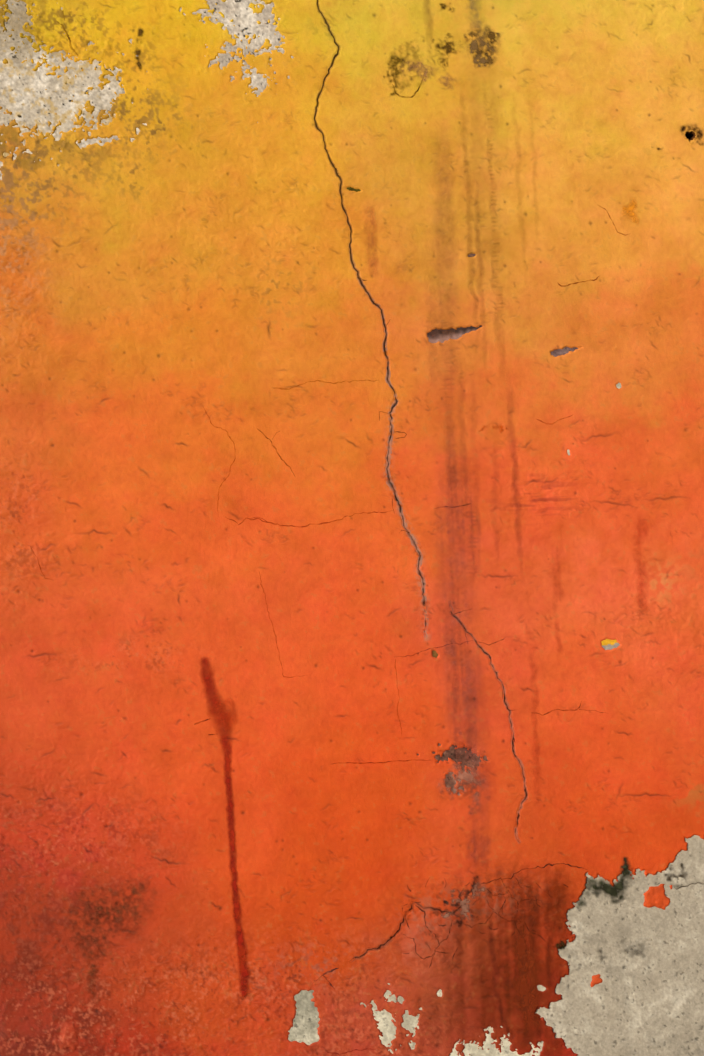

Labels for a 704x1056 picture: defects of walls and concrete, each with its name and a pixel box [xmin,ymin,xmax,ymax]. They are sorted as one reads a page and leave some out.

peeling [0,0,147,180]
peeling [179,0,294,97]
water stain [387,56,427,95]
water stain [436,34,454,85]
water stain [465,29,499,67]
crack [202,0,528,844]
crack [537,701,609,716]
rust [202,659,249,997]
crack [313,863,587,988]
peeling [450,835,704,1056]
crack [669,881,704,890]
peeling [360,983,422,1054]